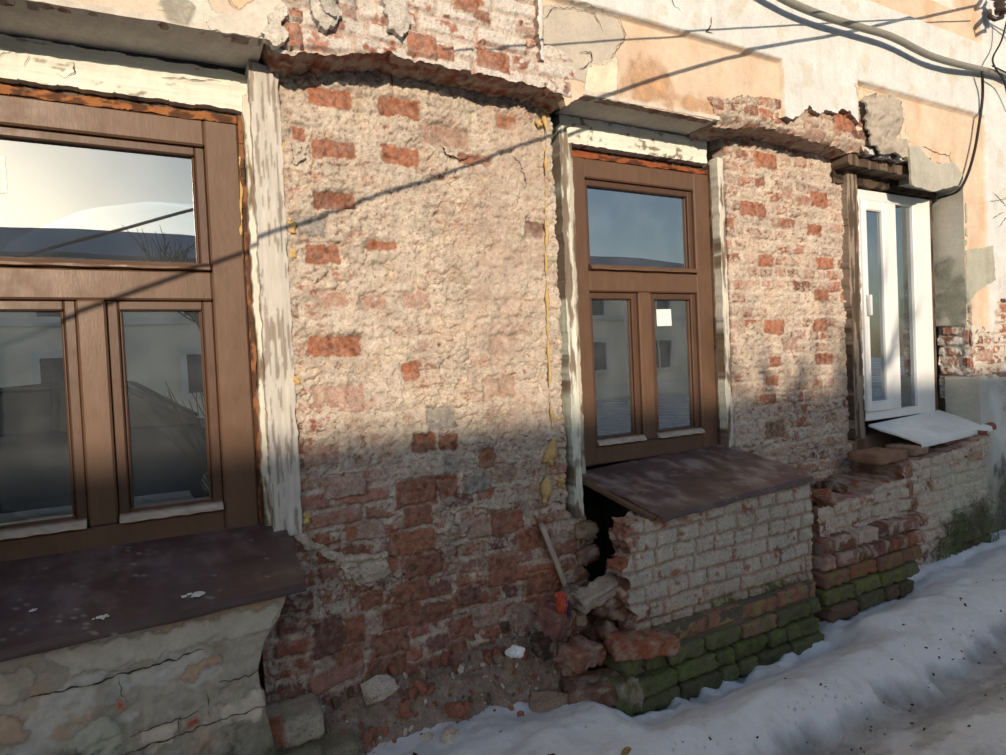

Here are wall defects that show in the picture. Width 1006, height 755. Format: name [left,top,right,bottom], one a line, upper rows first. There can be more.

spalling [686,83,882,488]
spalling [43,0,624,725]
spalling [937,300,1006,398]
damp [994,459,1006,530]
peeling [63,699,126,755]
crack [25,649,203,703]
peeling [135,717,200,755]
crack [125,668,264,755]